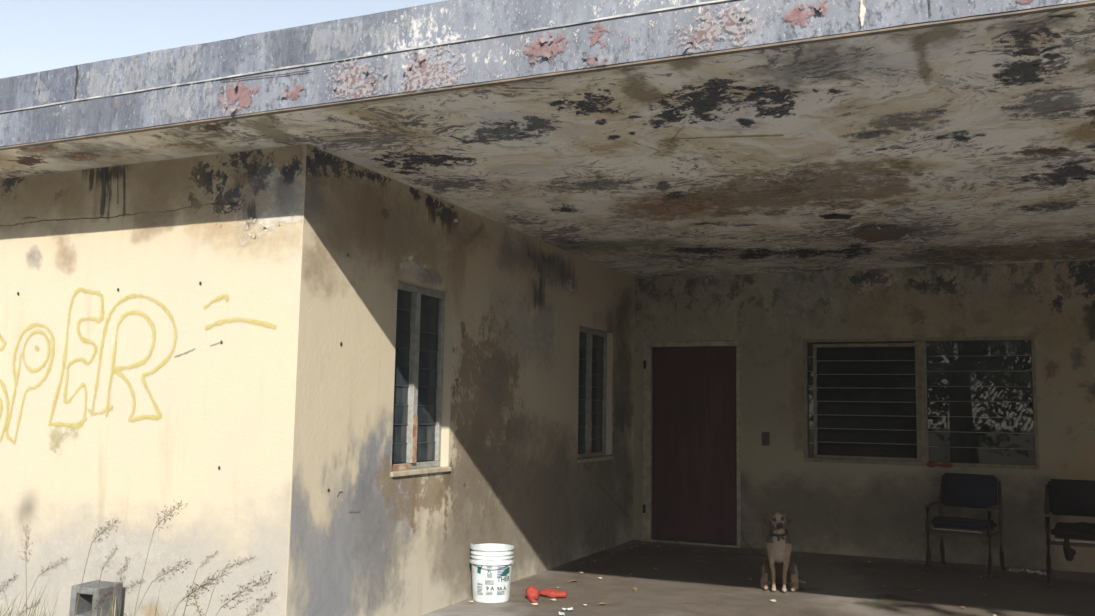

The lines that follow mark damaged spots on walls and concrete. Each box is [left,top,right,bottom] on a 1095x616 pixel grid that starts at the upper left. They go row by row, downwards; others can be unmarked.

water stain [959,16,1095,120]
water stain [0,177,23,199]
water stain [65,145,128,218]
crack [0,199,241,226]
water stain [181,118,290,227]
water stain [306,50,840,234]
water stain [956,125,1095,189]
water stain [1008,201,1088,214]
water stain [666,244,879,262]
water stain [906,240,1095,340]